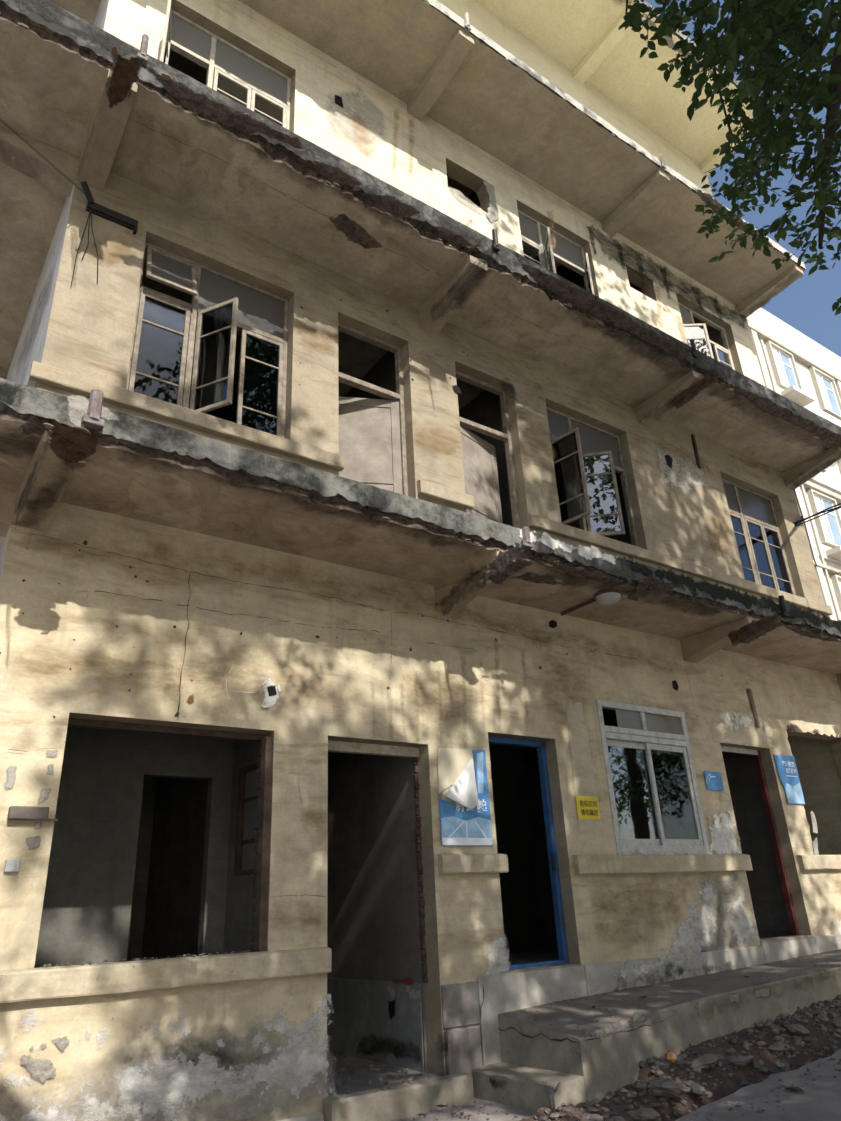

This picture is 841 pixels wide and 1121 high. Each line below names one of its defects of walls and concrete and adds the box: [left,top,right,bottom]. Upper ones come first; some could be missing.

spalling [0,0,841,447]
leakage [589,229,796,329]
leakage [0,434,66,524]
spalling [0,402,841,646]
crack [34,534,636,719]
peeling [705,809,741,854]
flaking render [483,938,509,975]
flaking render [21,1037,69,1084]